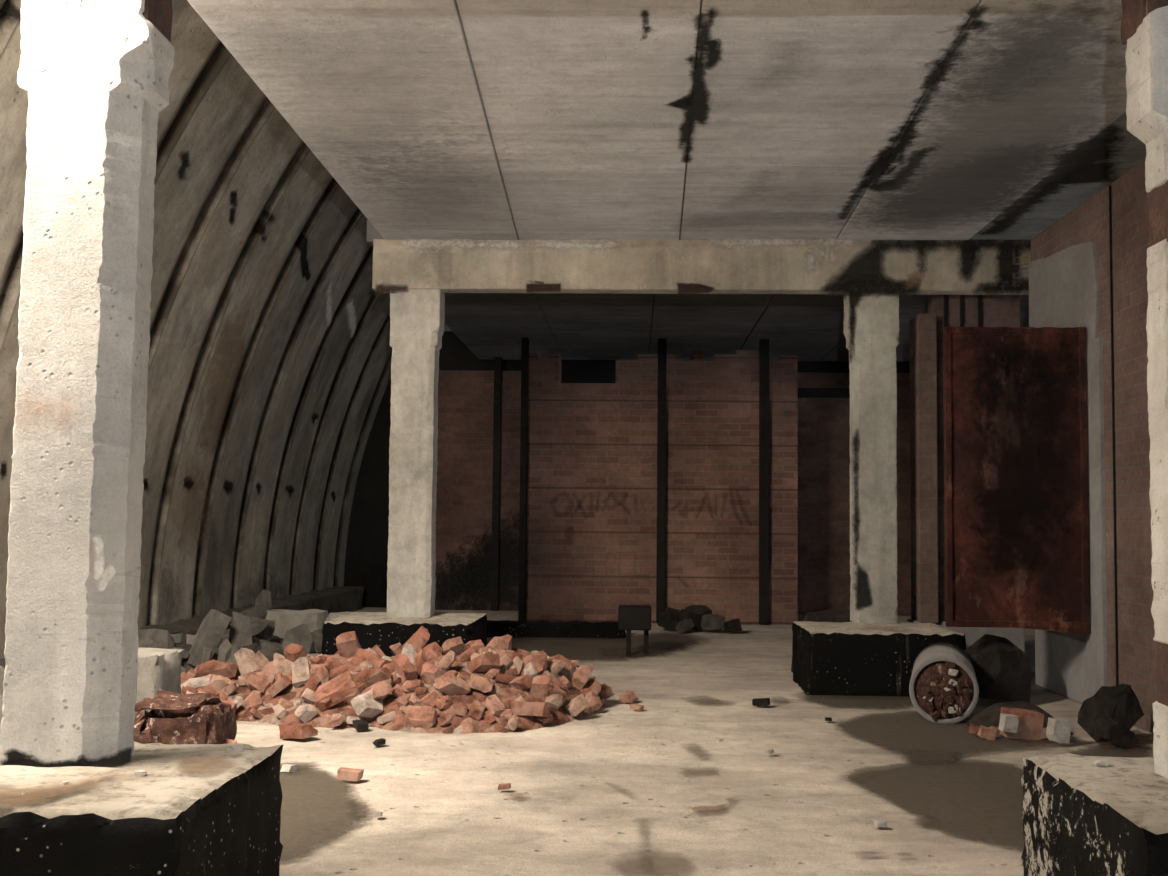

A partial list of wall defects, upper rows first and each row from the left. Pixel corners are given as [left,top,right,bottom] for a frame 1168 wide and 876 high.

water stain [669,10,721,163]
water stain [840,8,985,219]